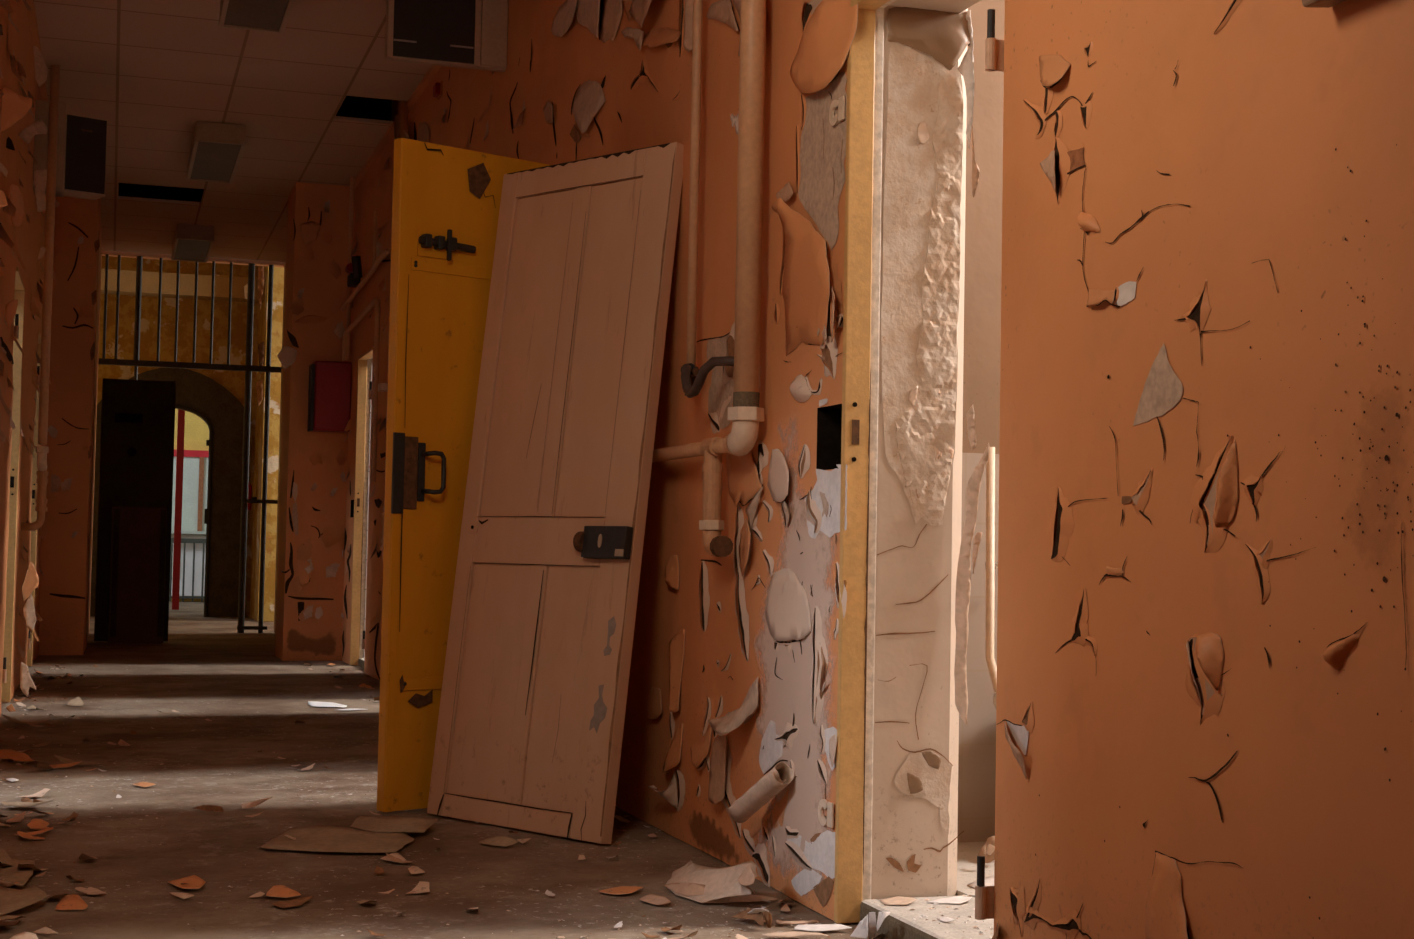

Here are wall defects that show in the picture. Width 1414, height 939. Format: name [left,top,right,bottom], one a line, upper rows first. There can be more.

peeling [551,0,741,58]
crack [1024,41,1096,138]
peeling [771,0,858,379]
crack [1078,165,1190,289]
flaking render [881,7,990,725]
crack [1174,279,1250,365]
crack [1056,402,1203,658]
peeling [1190,434,1316,604]
flaking render [647,423,847,907]
peeling [1184,632,1229,725]
crack [1188,751,1237,822]
crack [1024,878,1092,939]